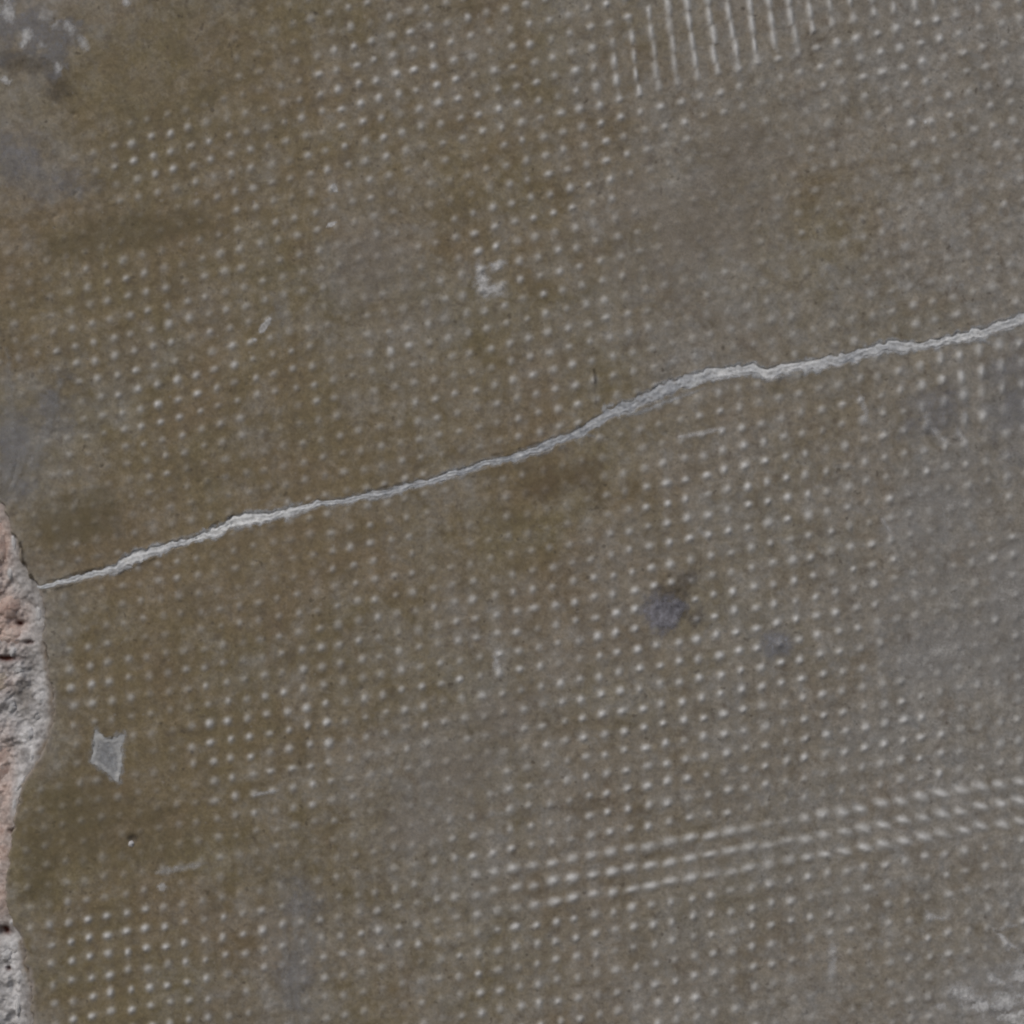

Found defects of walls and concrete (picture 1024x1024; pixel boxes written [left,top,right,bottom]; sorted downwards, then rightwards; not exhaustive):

crack [19,312,1024,589]
spalling [0,502,55,1024]